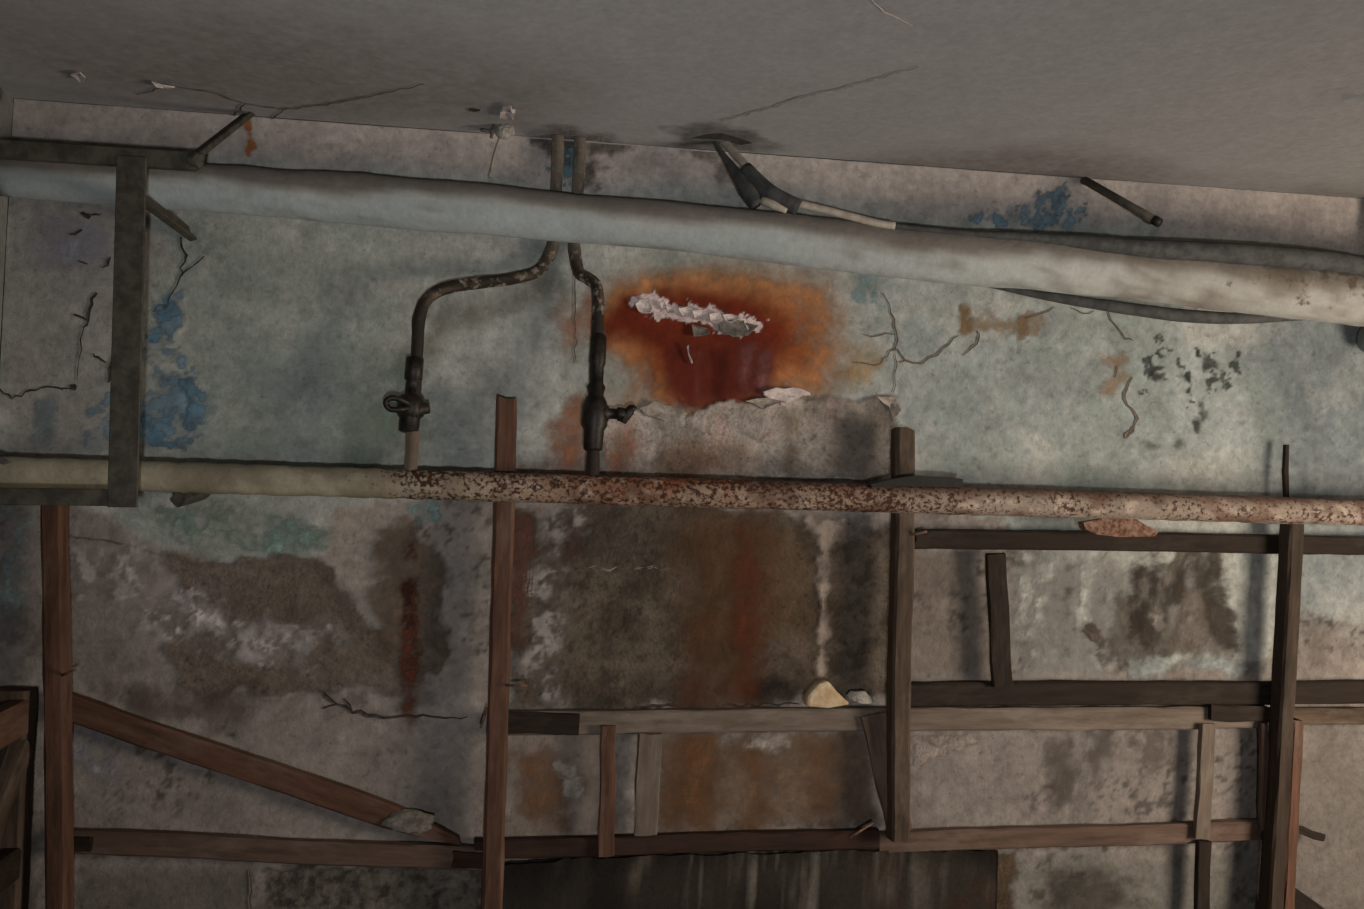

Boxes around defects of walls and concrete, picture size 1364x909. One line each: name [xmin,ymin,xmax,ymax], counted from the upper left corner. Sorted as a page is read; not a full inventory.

peeling [968,182,1087,233]
crack [0,211,111,400]
peeling [140,290,207,450]
rust [566,268,842,417]
crack [852,293,980,392]
rust [960,305,1044,339]
water stain [69,536,331,666]
crack [321,691,468,719]
rust [400,580,420,723]
water stain [519,508,585,706]
water stain [804,515,868,678]
water stain [1068,552,1256,678]